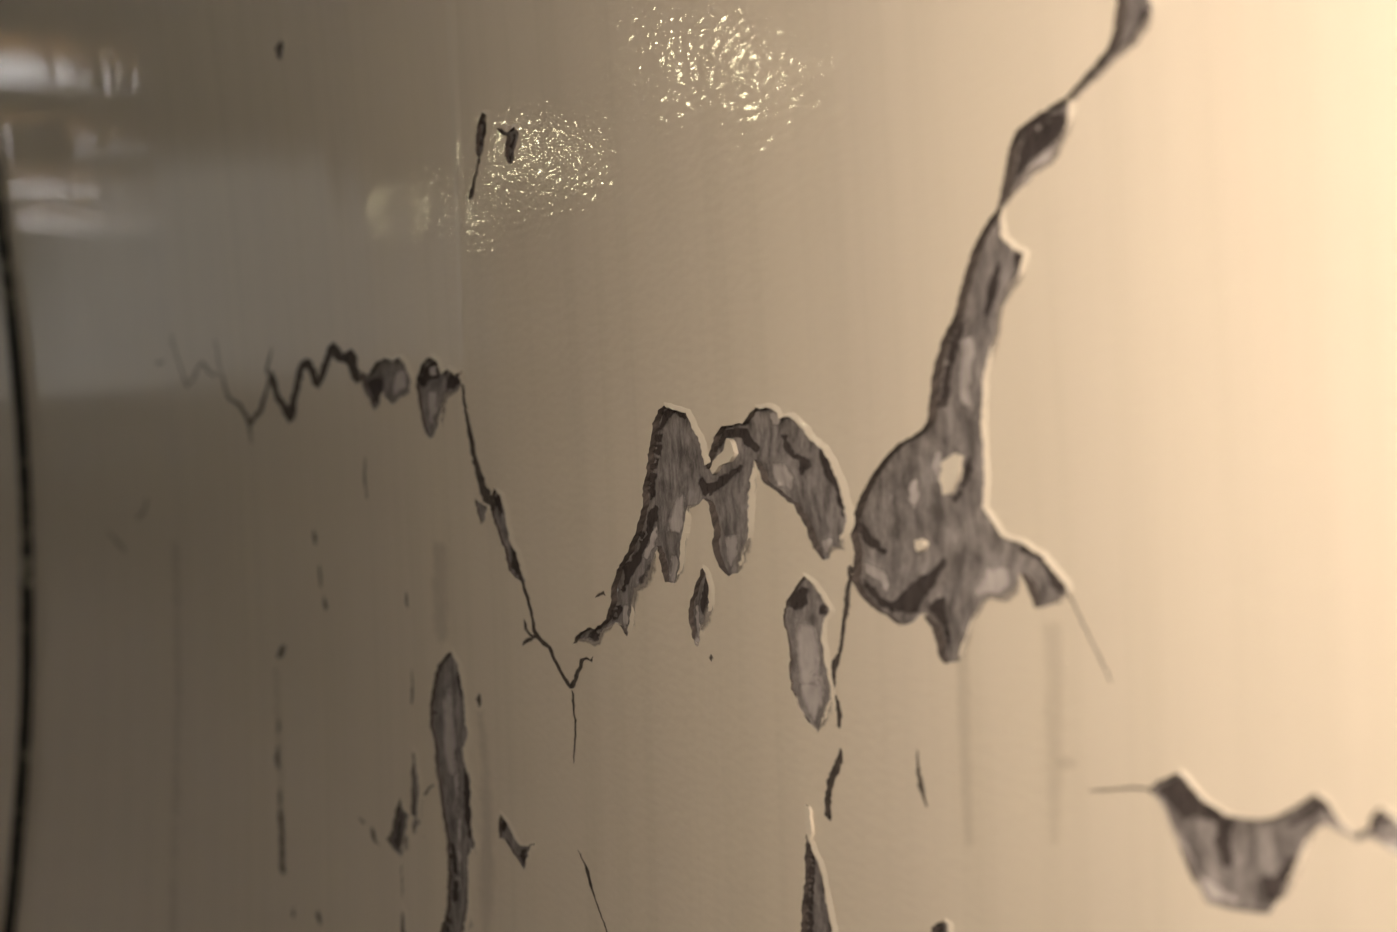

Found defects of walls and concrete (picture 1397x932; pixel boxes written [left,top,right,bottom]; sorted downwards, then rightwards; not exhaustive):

spalling [467,109,523,200]
spalling [574,0,1159,664]
crack [156,335,593,761]
spalling [783,573,836,732]
spalling [358,648,481,932]
crack [578,851,607,932]
spalling [801,805,839,932]
spalling [931,918,954,932]
spalling [1148,769,1397,914]